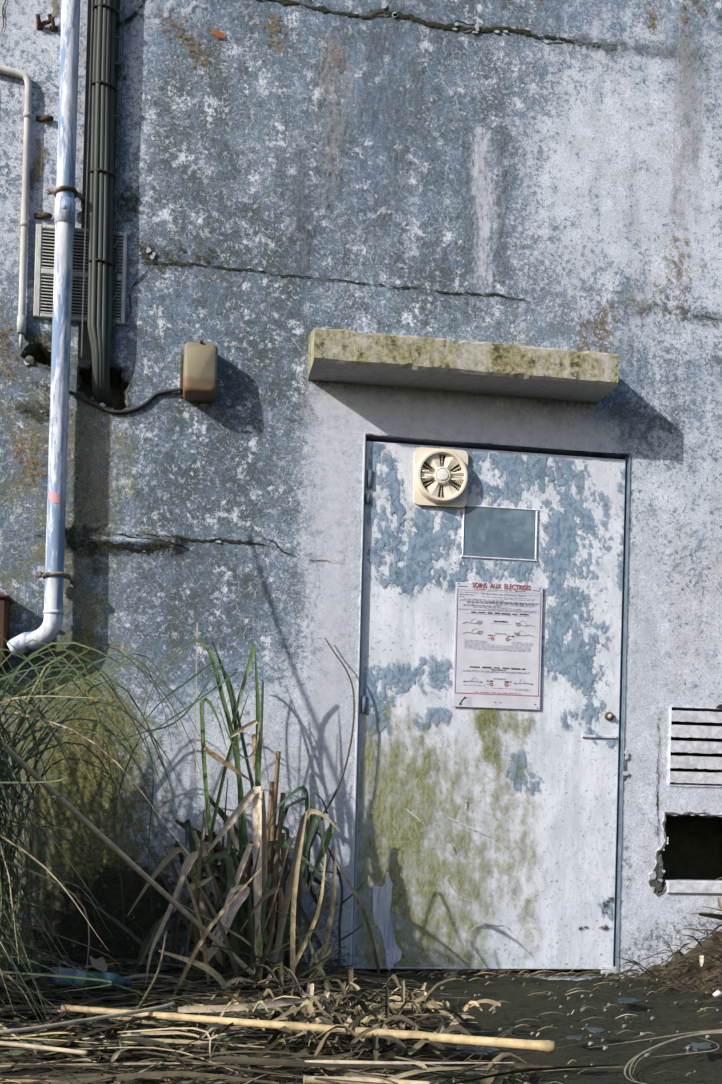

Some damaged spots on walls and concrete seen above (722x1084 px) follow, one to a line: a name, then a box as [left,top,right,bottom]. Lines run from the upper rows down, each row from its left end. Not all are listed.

crack [119,0,144,24]
crack [273,0,615,47]
crack [126,261,529,323]
spalling [18,340,52,370]
spalling [76,362,132,410]
crack [19,527,333,563]
peeling [298,381,629,851]
spalling [670,704,722,783]
spalling [648,812,722,896]